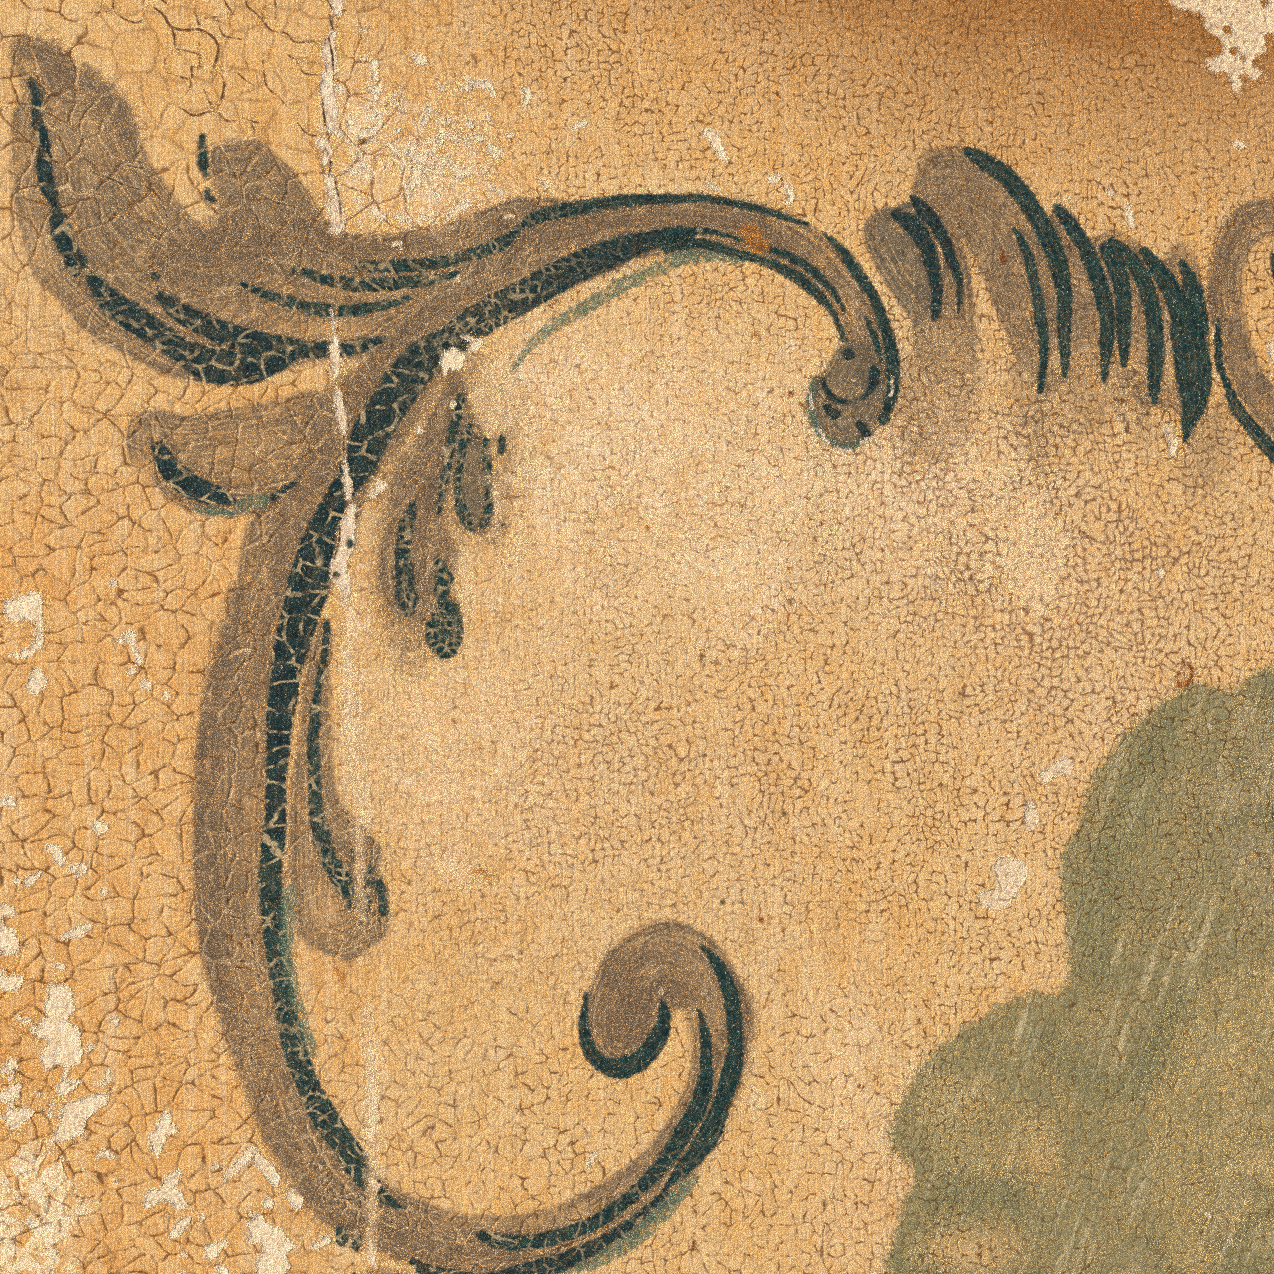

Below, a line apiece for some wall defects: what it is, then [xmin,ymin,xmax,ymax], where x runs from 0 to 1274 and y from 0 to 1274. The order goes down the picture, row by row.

peeling [1169,0,1274,92]
crack [88,0,357,607]
peeling [2,590,48,695]
crack [342,650,352,730]
peeling [0,902,23,992]
crack [230,914,279,1064]
peeling [0,962,111,1274]
crack [366,1071,377,1144]
peeling [141,1167,205,1239]
peeling [212,1146,331,1274]
crack [321,1164,381,1202]
crack [367,1241,377,1267]